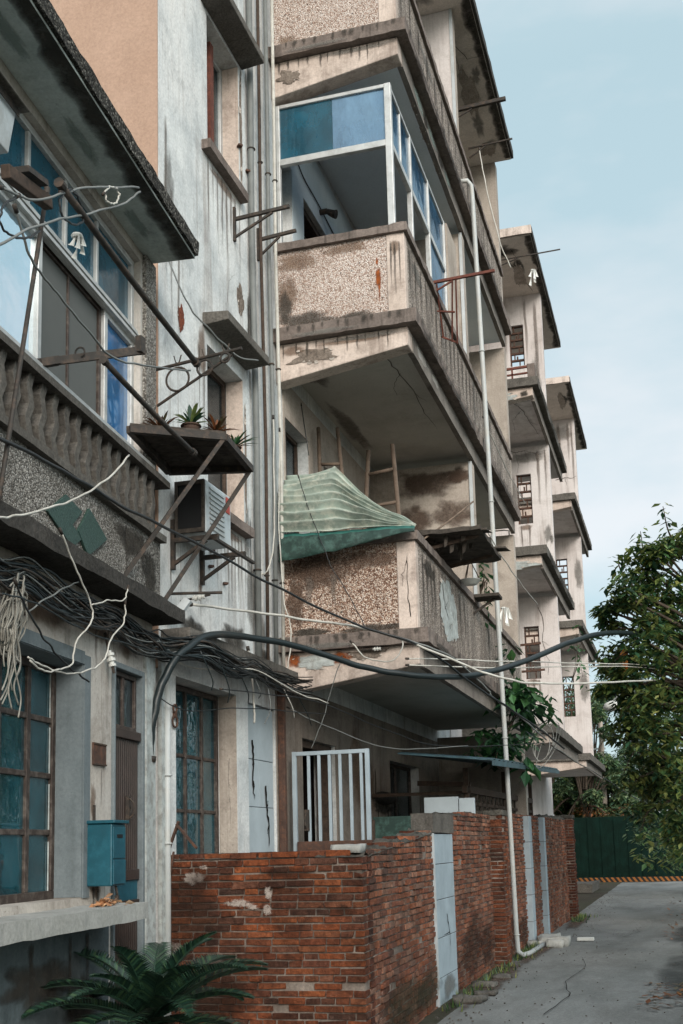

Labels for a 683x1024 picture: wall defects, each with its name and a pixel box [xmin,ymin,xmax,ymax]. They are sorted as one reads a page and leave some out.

peeling [276,70,300,84]
damp [462,0,510,159]
damp [410,29,504,308]
damp [283,256,312,269]
damp [273,283,389,355]
peeling [286,347,338,365]
peeling [439,577,459,642]
peeling [289,655,335,670]
crack [228,740,270,845]
crack [544,936,640,1014]